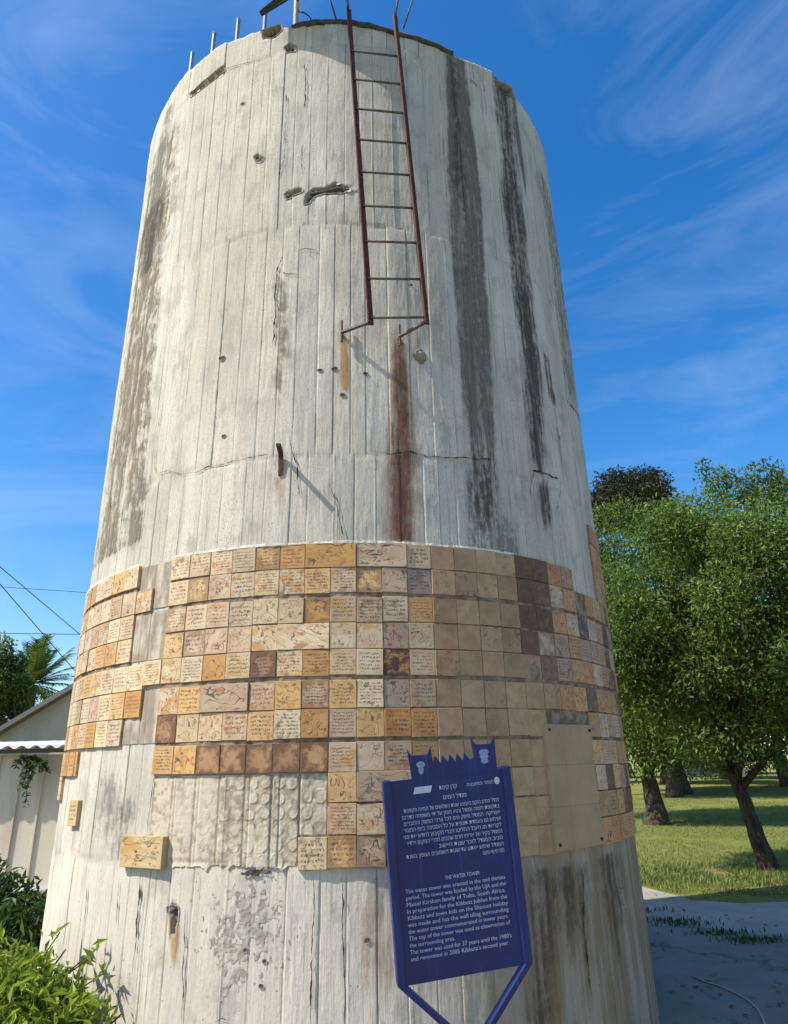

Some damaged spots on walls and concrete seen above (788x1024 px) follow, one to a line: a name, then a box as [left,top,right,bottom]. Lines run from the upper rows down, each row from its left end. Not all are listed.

spalling [188,64,226,98]
damp [141,105,171,273]
spalling [283,181,357,205]
rust [341,338,349,391]
rust [387,346,416,541]
crack [382,451,497,460]
damp [446,54,518,555]
damp [494,76,556,525]
damp [541,176,575,400]
rust [170,914,178,961]